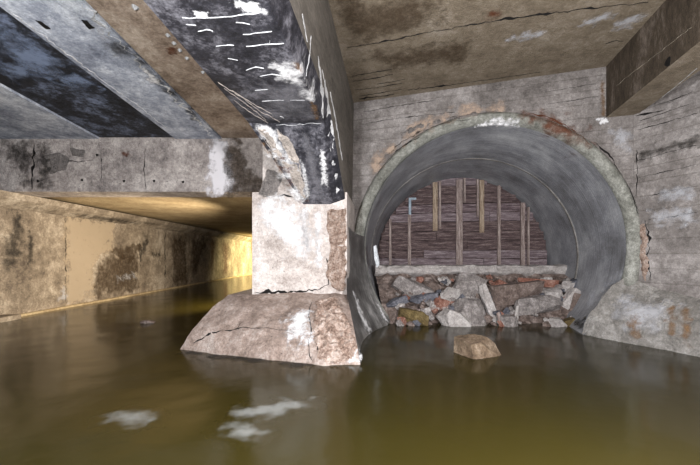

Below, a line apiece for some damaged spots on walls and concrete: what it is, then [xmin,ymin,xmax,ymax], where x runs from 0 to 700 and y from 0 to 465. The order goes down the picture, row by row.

water stain [3,11,167,129]
water stain [375,42,465,66]
crack [348,2,648,48]
crack [29,146,37,188]
water stain [81,4,263,198]
peeling [218,82,307,198]
water stain [246,14,342,267]
corrosion [524,113,592,146]
water stain [4,216,33,266]
water stain [94,240,160,298]
crack [194,259,329,360]
water stain [286,311,312,344]